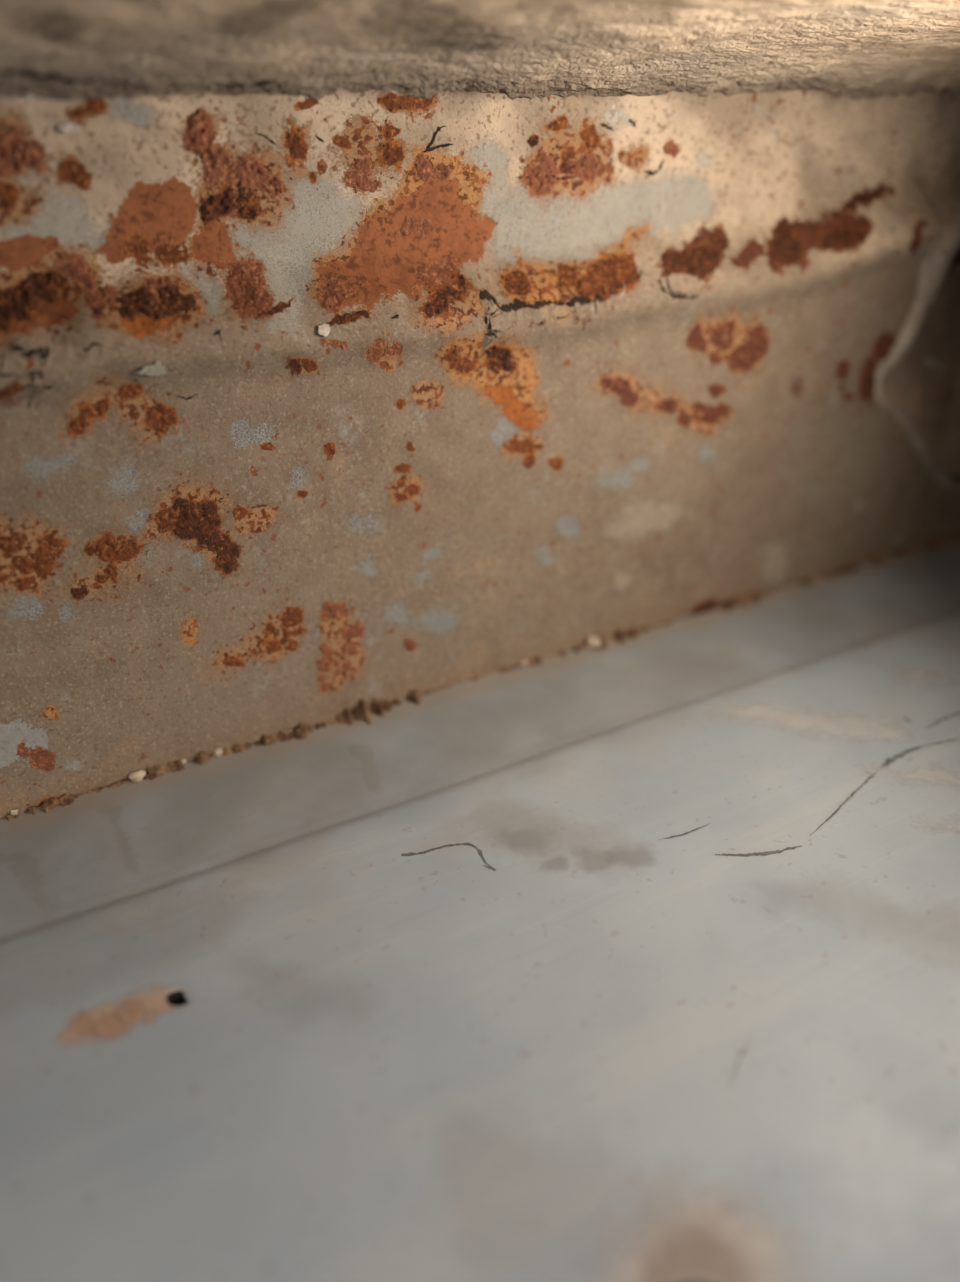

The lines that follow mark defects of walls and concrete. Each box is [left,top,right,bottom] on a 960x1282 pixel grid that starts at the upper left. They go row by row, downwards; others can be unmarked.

rust [0,92,898,471]
crack [479,264,700,355]
rust [388,441,428,513]
rust [0,465,285,610]
rust [175,593,373,703]
crack [659,712,960,856]
crack [401,842,497,870]